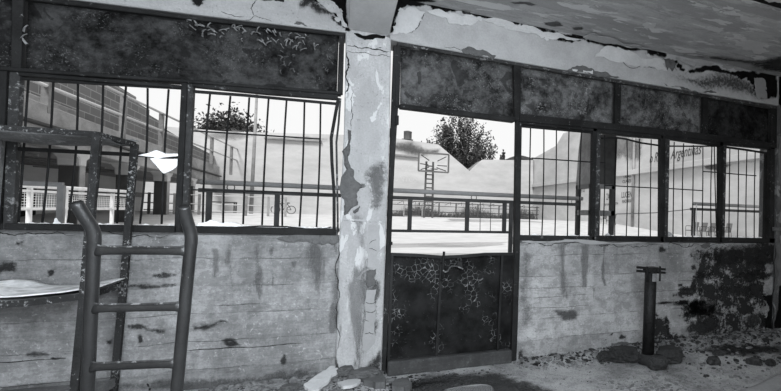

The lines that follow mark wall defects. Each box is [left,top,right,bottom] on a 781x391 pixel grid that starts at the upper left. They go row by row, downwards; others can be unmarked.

peeling [317,0,348,28]
peeling [393,7,667,71]
spalling [567,65,619,78]
peeling [676,56,743,71]
peeling [754,78,767,100]
spalling [340,130,362,215]
damp [0,262,16,272]
spalling [365,269,376,288]
damp [655,243,774,340]